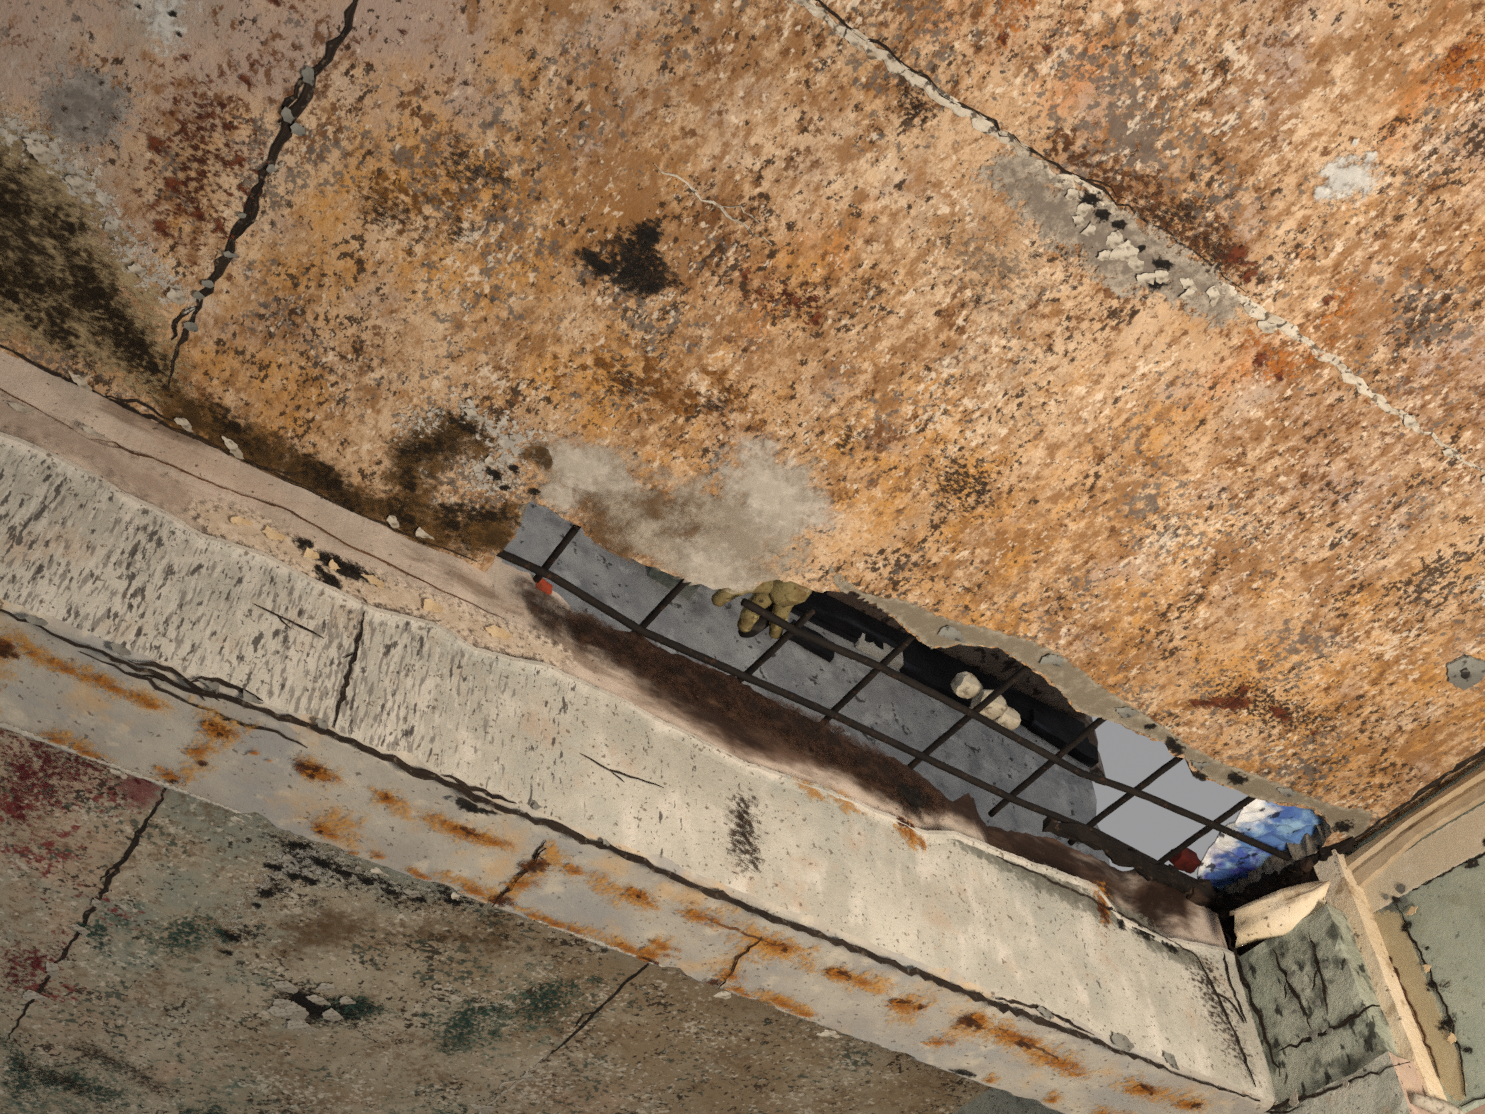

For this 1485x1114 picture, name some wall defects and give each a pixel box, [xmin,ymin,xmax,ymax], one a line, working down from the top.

crack [0,0,504,619]
water stain [0,109,558,558]
crack [654,163,772,245]
crack [791,0,1485,485]
peeling [0,722,251,823]
rust [293,756,342,791]
rust [302,786,939,1027]
crack [0,604,1410,1114]
peeling [713,991,731,999]
spalling [496,524,1372,970]
rust [923,999,1095,1103]
rust [1188,669,1347,746]